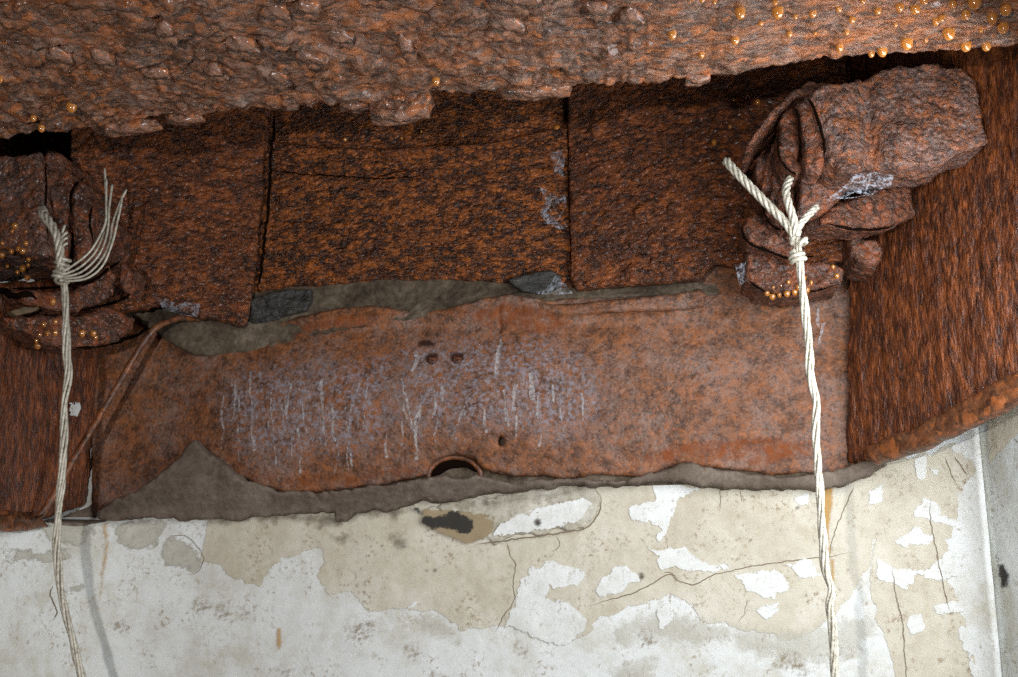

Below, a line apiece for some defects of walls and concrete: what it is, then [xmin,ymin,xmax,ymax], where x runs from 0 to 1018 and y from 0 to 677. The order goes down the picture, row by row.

rust [484,0,542,43]
rust [91,110,206,138]
rust [339,91,435,127]
rust [495,82,573,102]
rust [685,72,711,87]
peeling [0,508,96,564]
crack [481,492,601,629]
peeling [113,443,983,677]
crack [587,488,854,607]
rust [824,487,832,533]
crack [929,503,950,611]
crack [892,571,907,677]